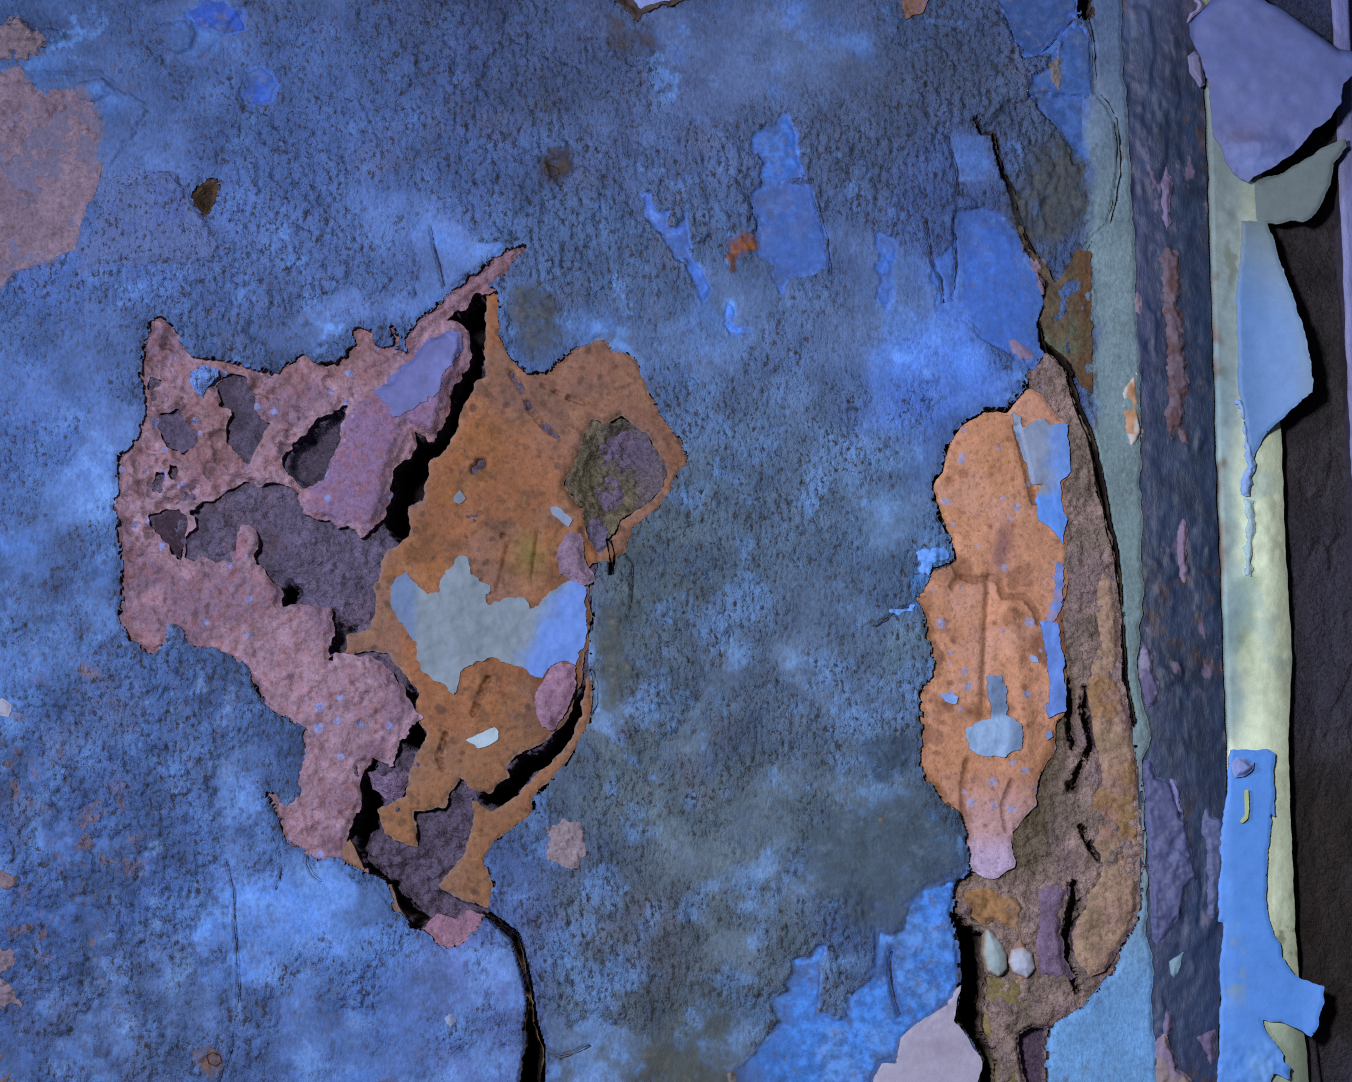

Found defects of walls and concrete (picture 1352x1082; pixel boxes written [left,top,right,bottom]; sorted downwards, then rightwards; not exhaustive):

flaking render [0,66,103,289]
spalling [615,0,684,22]
peeling [753,121,799,181]
peeling [901,0,929,20]
crack [926,219,957,302]
peeling [999,0,1093,160]
peeling [1186,0,1352,577]
crack [946,119,1135,723]
spalling [113,246,688,949]
peeling [0,698,12,717]
spalling [759,338,1324,1082]
crack [482,911,590,1082]